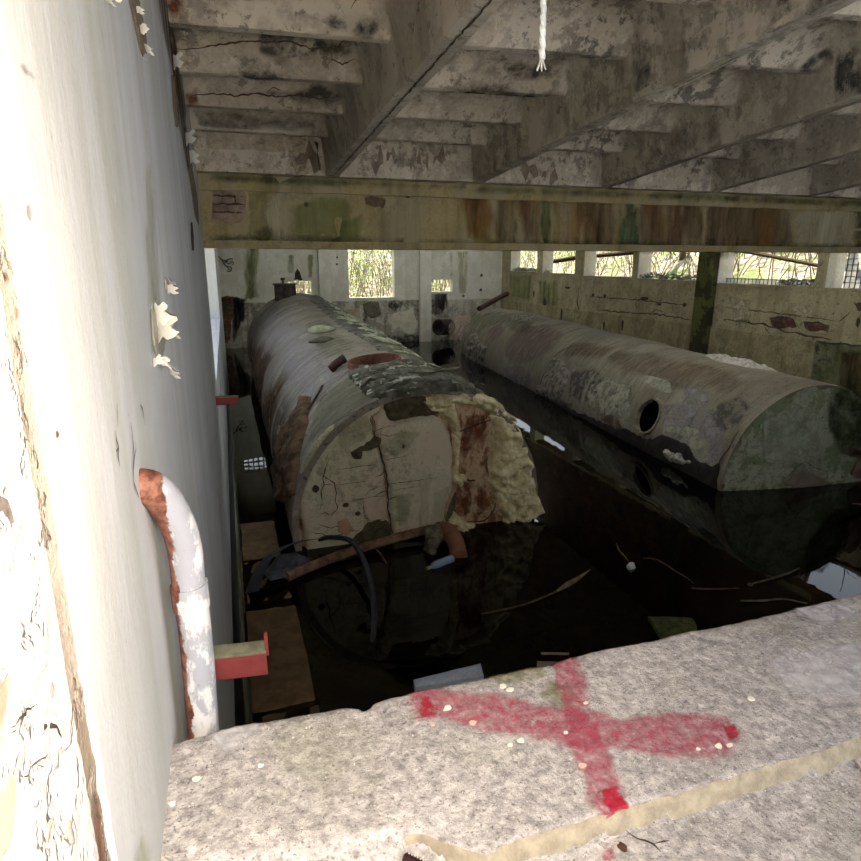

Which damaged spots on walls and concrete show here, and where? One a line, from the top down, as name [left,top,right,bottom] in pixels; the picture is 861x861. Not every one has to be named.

peeling [107,0,155,64]
crack [180,40,354,66]
crack [314,0,492,173]
leakage [803,49,861,94]
peeling [151,278,181,379]
leakage [432,294,448,315]
spalling [770,316,829,332]
leakage [548,369,630,417]
leakage [565,344,748,463]
spalling [0,137,118,861]
crack [10,704,62,777]
crack [627,831,669,852]